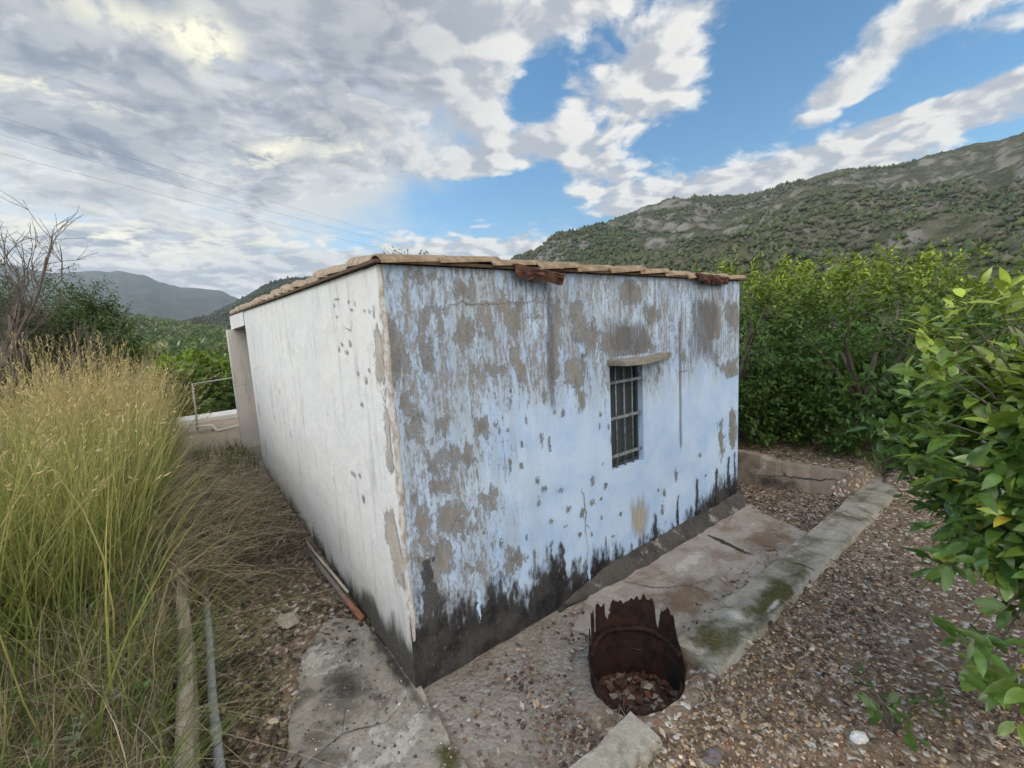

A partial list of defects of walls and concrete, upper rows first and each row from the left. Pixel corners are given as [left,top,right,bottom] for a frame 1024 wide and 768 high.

peeling [695,272,739,340]
peeling [717,353,738,378]
peeling [333,263,663,597]
peeling [717,407,738,461]
crack [747,469,838,481]
leakage [264,456,738,689]
crack [708,535,753,555]
crack [302,692,411,768]